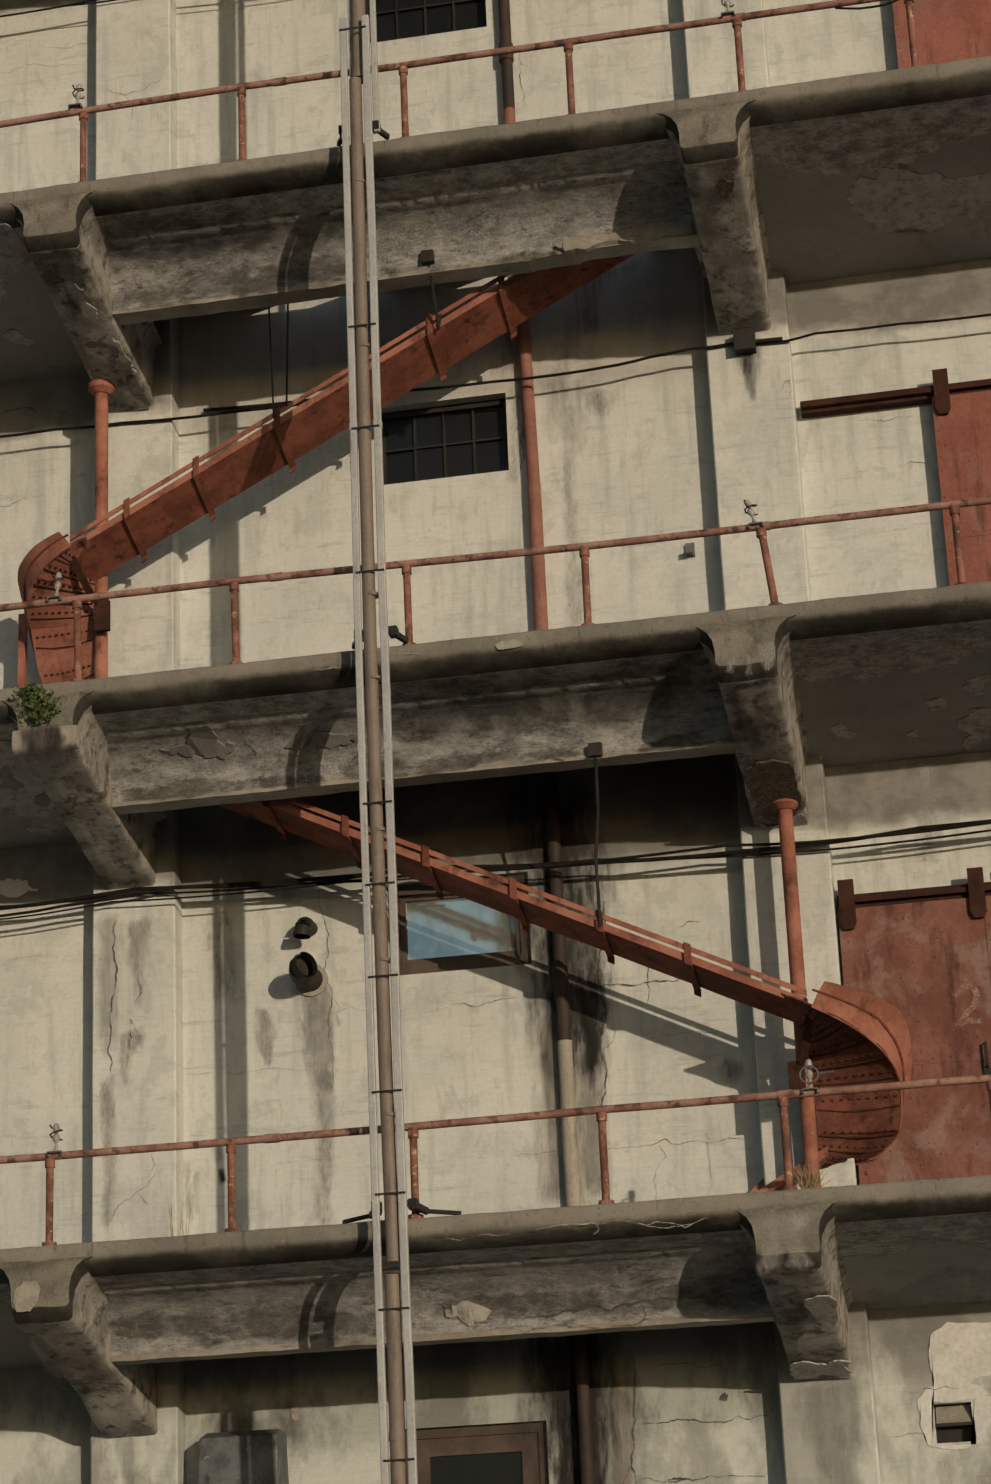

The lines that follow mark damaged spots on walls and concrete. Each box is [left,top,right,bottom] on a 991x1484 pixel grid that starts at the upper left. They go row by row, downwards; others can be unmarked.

peeling [0,223,27,304]
spalling [744,759,808,829]
peeling [0,878,39,897]
crack [107,920,142,1071]
spalling [790,1290,838,1328]
spalling [788,1360,855,1380]
water stain [548,1340,602,1484]
crack [622,1361,768,1484]
peeling [931,1396,991,1450]